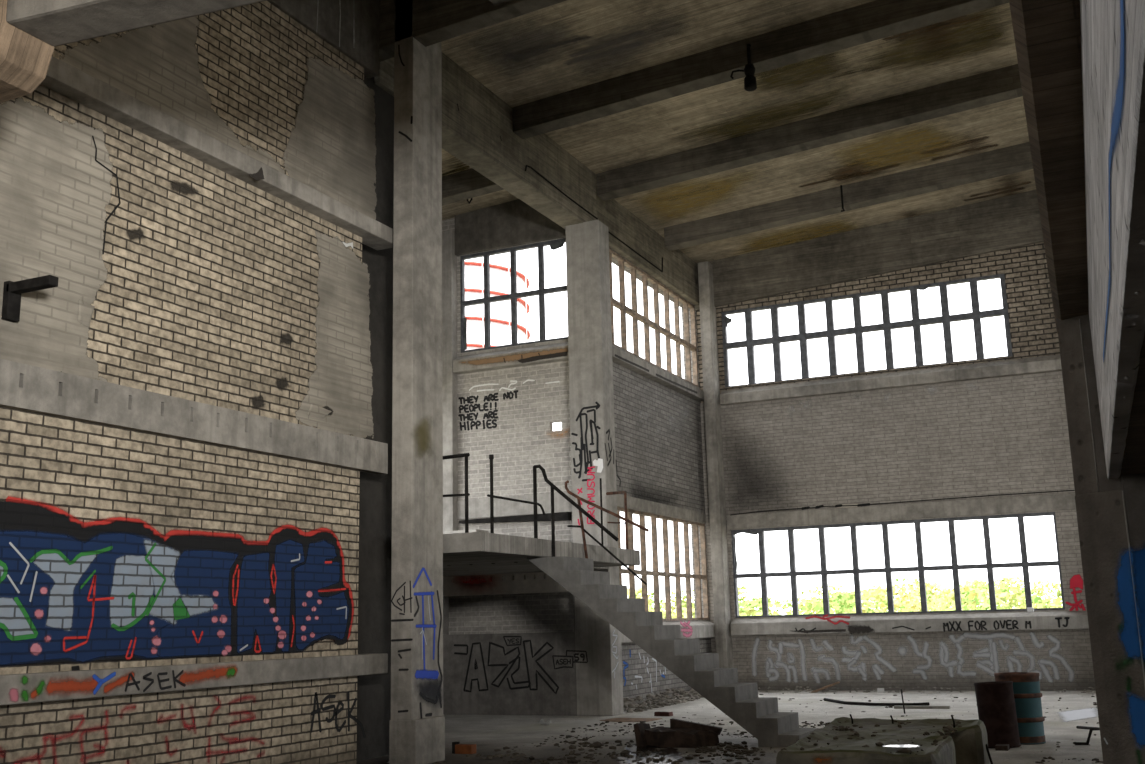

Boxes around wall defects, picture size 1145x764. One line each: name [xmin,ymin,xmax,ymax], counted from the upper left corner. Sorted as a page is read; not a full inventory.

spalling [171,181,198,195]
spalling [127,227,145,240]
spalling [280,333,293,345]
spalling [277,378,289,391]
spalling [252,395,264,409]